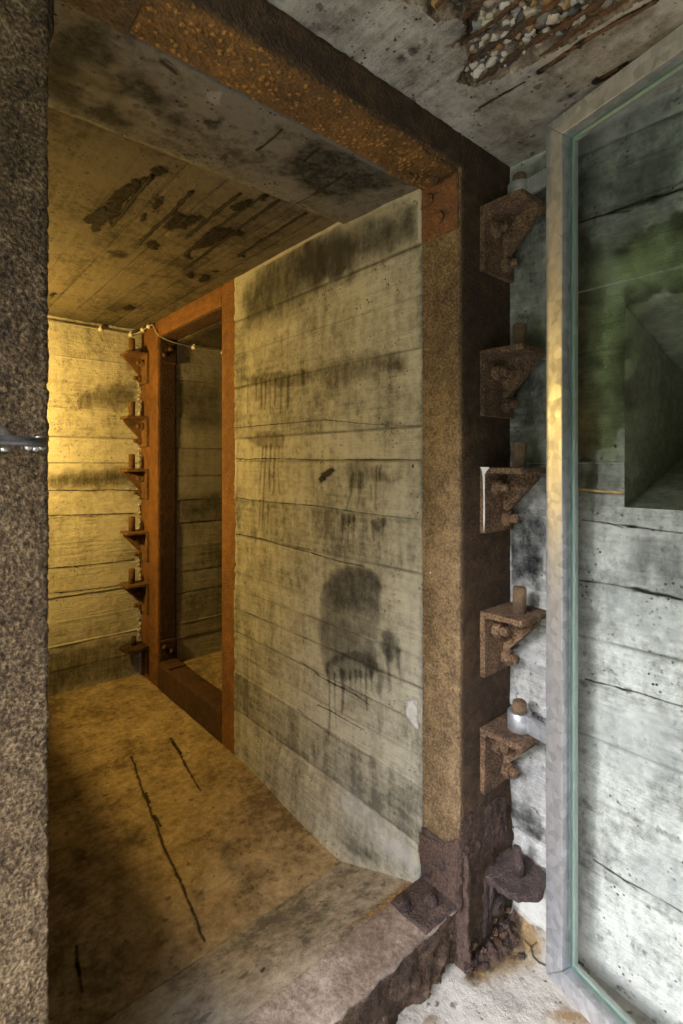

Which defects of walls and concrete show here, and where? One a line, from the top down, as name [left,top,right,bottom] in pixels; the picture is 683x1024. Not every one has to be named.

spalling [388,0,659,88]
leakage [247,209,413,320]
leakage [327,568,400,710]
crack [169,737,201,791]
crack [130,756,206,942]
corrosion [418,794,539,980]
crack [75,945,84,993]